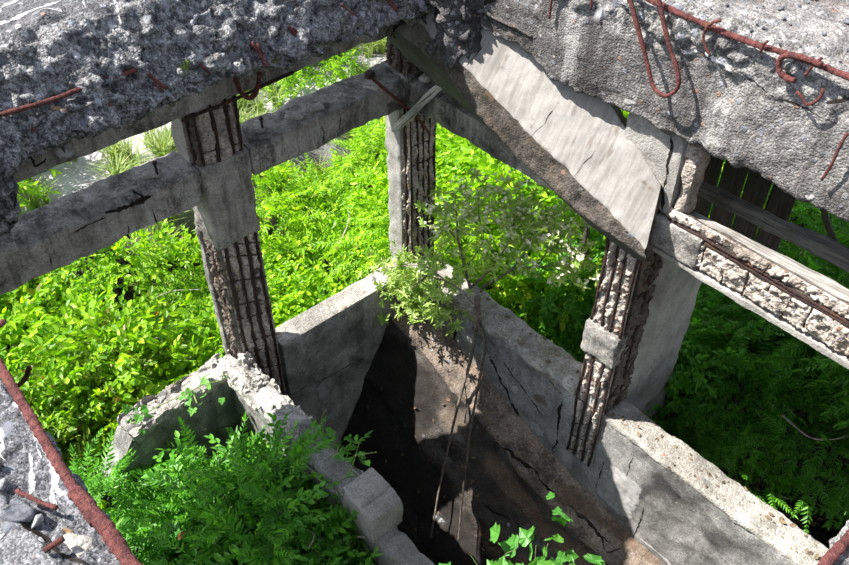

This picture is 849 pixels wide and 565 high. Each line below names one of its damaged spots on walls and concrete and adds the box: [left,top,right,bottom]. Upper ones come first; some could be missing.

crack [0,0,61,25]
spalling [386,33,432,83]
spalling [184,95,266,167]
crack [74,190,158,239]
spalling [400,105,437,263]
spalling [203,231,287,396]
crack [487,350,563,454]
spalling [566,237,663,468]
spalling [667,207,849,359]
crack [496,442,644,553]
peeling [596,466,641,519]